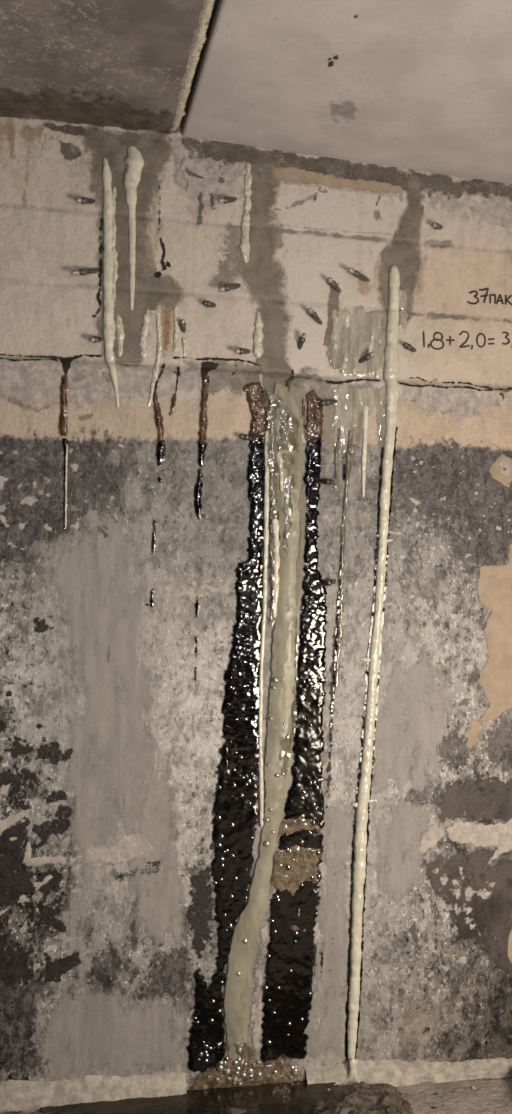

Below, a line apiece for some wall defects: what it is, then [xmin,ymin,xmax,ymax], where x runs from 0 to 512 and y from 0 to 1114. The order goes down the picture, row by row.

crack [0,353,101,375]
corrosion [59,375,69,436]
corrosion [198,376,210,442]
crack [153,357,261,396]
corrosion [243,382,267,440]
leakage [0,86,512,628]
corrosion [302,390,324,442]
crack [285,370,512,395]
peeling [389,437,512,753]
leakage [277,620,300,778]